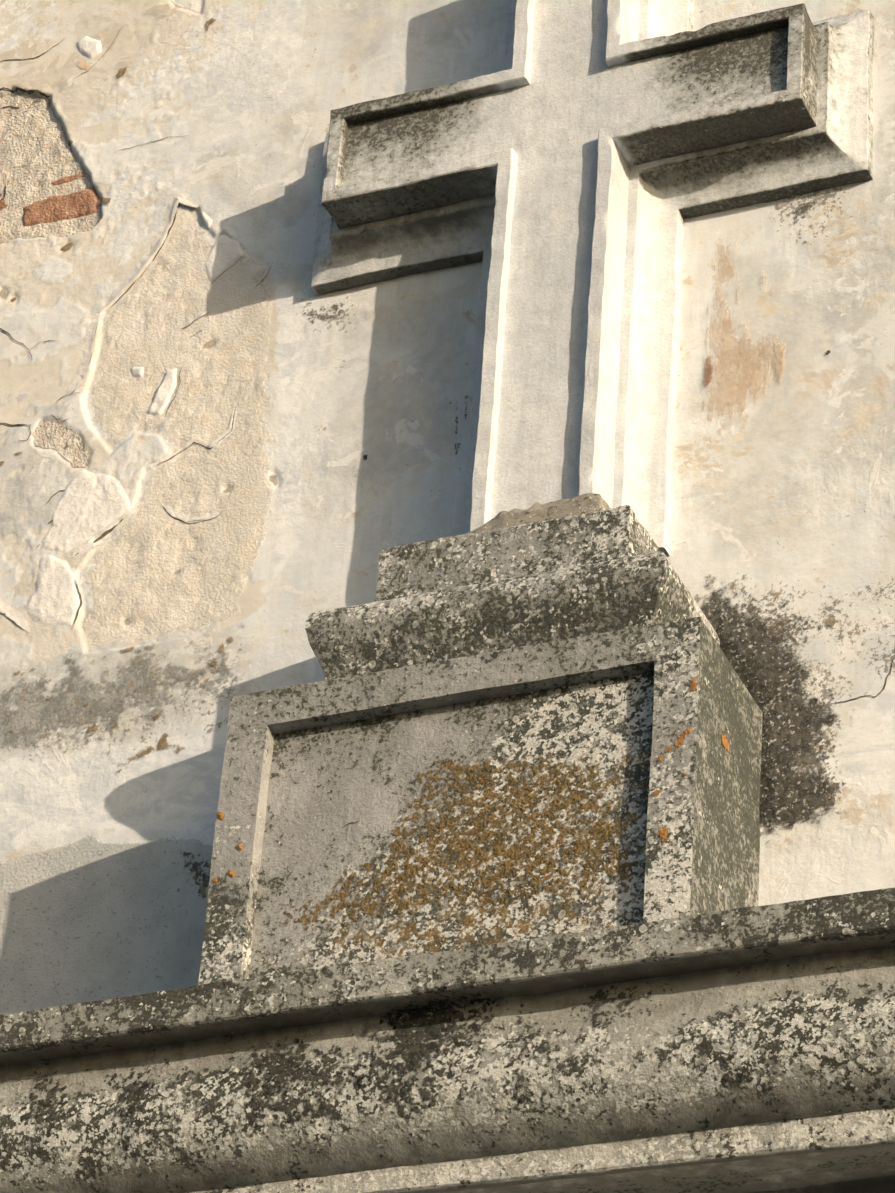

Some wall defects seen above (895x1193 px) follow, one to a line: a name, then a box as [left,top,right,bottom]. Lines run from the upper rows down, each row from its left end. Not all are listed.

flaking render [0,87,111,251]
flaking render [0,193,277,646]
leakage [695,575,846,836]
crack [826,635,895,706]
leakage [13,1067,70,1144]
leakage [104,1050,183,1157]
leakage [219,988,507,1141]
leakage [498,1036,541,1112]
leakage [588,987,657,1027]
leakage [716,1003,752,1115]